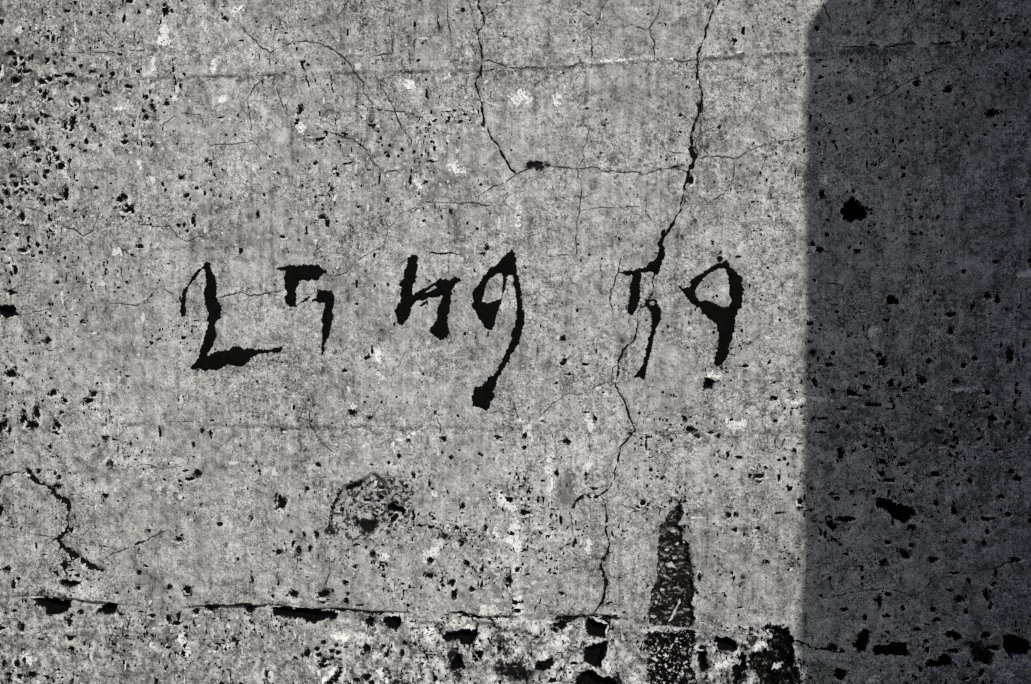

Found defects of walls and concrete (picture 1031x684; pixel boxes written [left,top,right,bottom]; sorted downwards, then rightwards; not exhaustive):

crack [328,0,997,276]
crack [0,471,167,576]
crack [480,253,681,613]